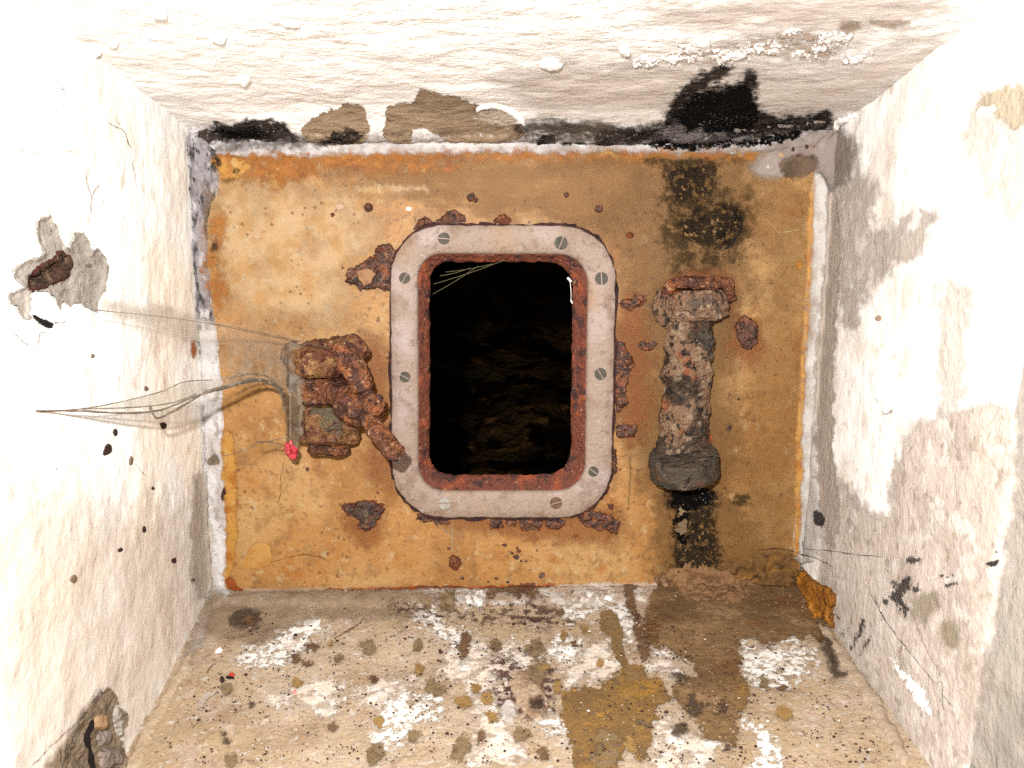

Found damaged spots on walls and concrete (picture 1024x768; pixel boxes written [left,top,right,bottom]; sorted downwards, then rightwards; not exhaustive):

leakage [197,118,322,152]
peeling [300,89,525,146]
leakage [511,41,937,146]
spalling [8,214,109,336]
rust [280,341,299,394]
rust [321,335,342,346]
rust [341,210,670,538]
leakage [523,137,1021,768]
spalling [63,687,128,768]